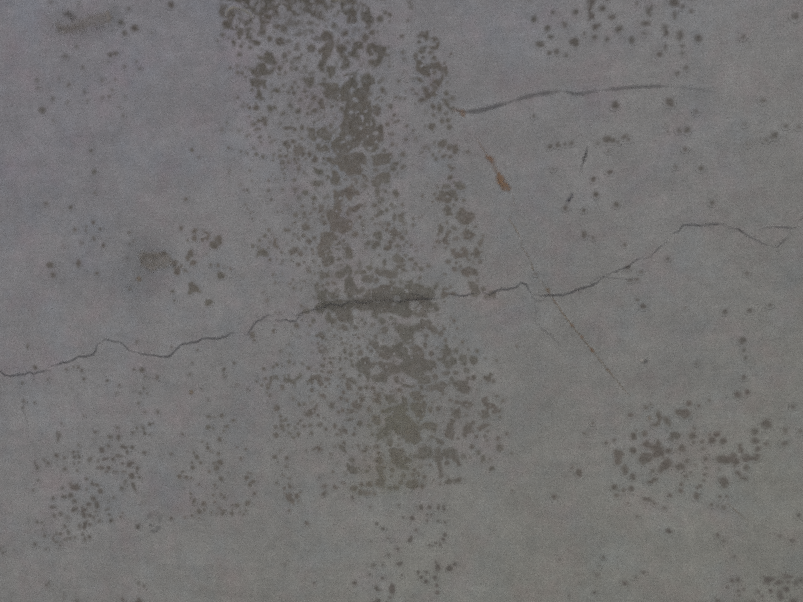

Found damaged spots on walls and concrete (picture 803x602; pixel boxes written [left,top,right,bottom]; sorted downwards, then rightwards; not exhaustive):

leakage [528,0,706,78]
leakage [161,224,247,308]
leakage [187,0,514,514]
leakage [30,364,161,553]
leakage [167,412,259,521]
leakage [603,397,803,520]